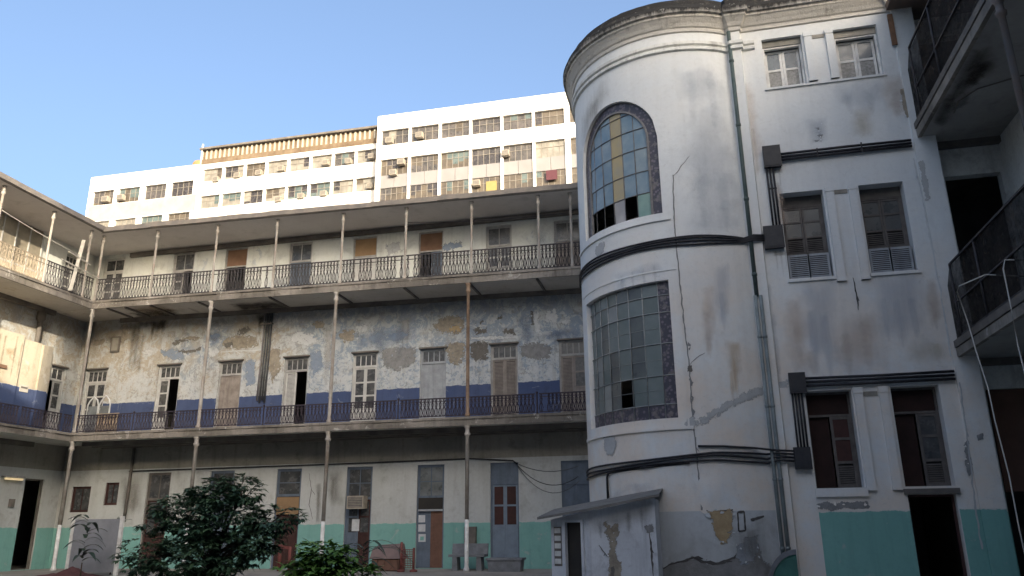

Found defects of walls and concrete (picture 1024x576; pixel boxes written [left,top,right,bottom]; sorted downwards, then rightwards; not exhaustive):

peeling [379,343,418,374]
peeling [432,308,572,365]
crack [672,158,704,481]
flaking render [603,521,622,576]
flaking render [663,546,771,576]
flaking render [705,508,736,545]